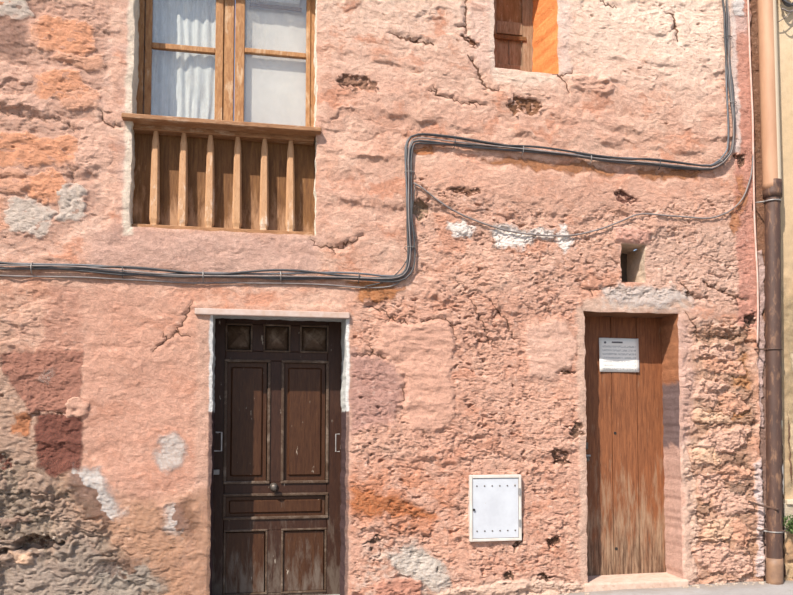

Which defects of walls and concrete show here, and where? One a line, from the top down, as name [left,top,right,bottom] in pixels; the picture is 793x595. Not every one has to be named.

crack [457,0,468,33]
crack [666,13,679,42]
spalling [337,74,378,92]
crack [428,55,500,107]
flaking render [0,0,114,240]
spalling [506,94,542,117]
spalling [614,187,637,205]
crack [153,301,193,351]
spalling [550,449,571,465]
spalling [0,452,106,578]